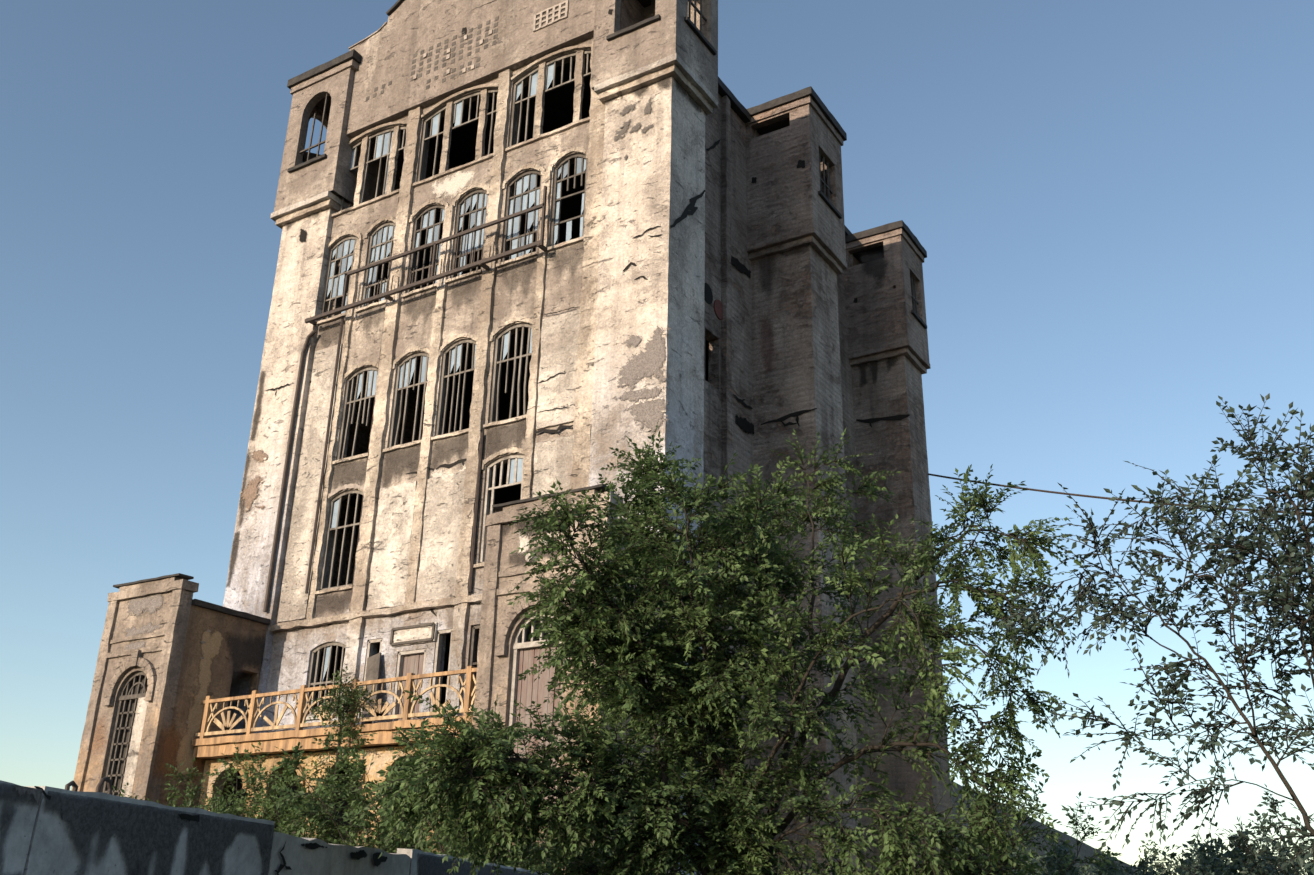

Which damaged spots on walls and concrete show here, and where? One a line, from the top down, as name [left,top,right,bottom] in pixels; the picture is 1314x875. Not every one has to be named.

peeling [614,97,654,141]
crack [623,190,705,280]
spalling [615,326,669,433]
peeling [176,627,224,775]
leakage [209,757,305,791]
leakage [0,783,275,875]
crack [275,842,292,875]